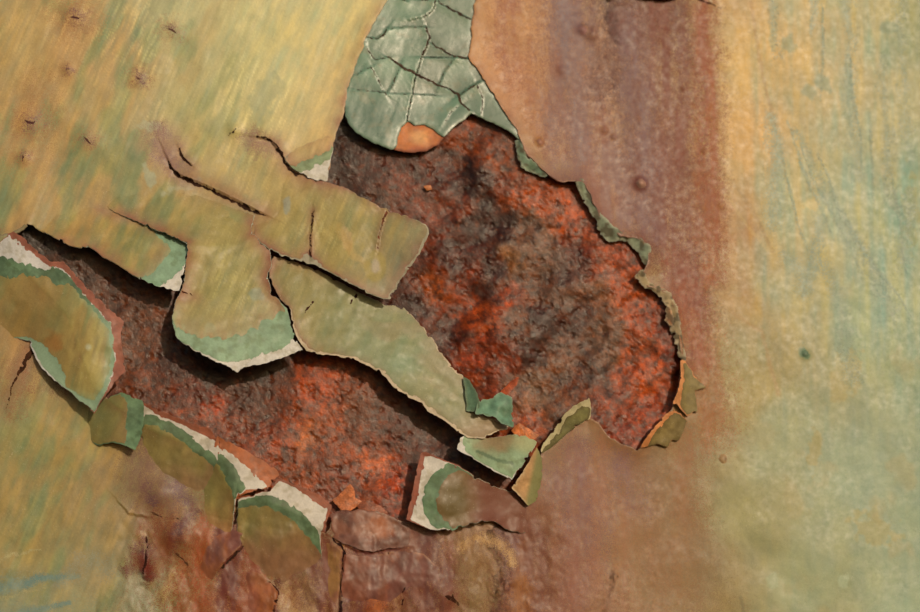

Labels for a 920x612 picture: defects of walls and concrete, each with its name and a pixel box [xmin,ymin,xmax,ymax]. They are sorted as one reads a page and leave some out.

crack [357,0,483,121]
crack [168,148,266,216]
crack [228,128,299,177]
crack [6,348,34,408]
peeling [0,136,591,612]
rust [0,110,681,612]
peeling [575,178,706,448]
crack [332,537,346,612]